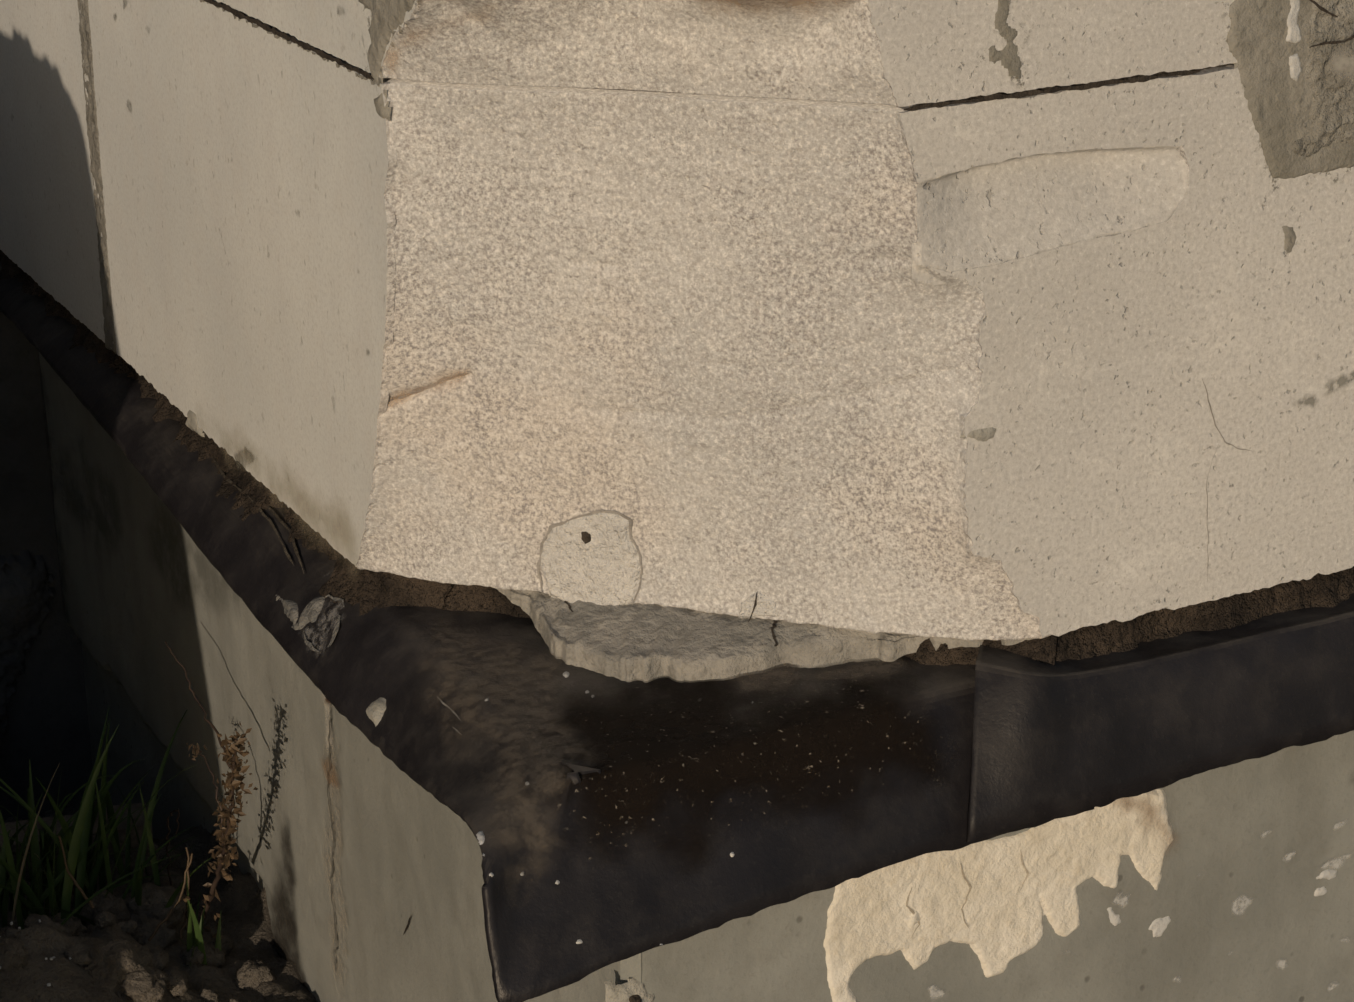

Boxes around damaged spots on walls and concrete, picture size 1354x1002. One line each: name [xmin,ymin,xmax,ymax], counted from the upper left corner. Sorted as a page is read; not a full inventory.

crack [200,0,378,85]
crack [904,70,1200,111]
spalling [357,0,1051,640]
crack [327,717,337,971]
peeling [823,789,1174,1002]